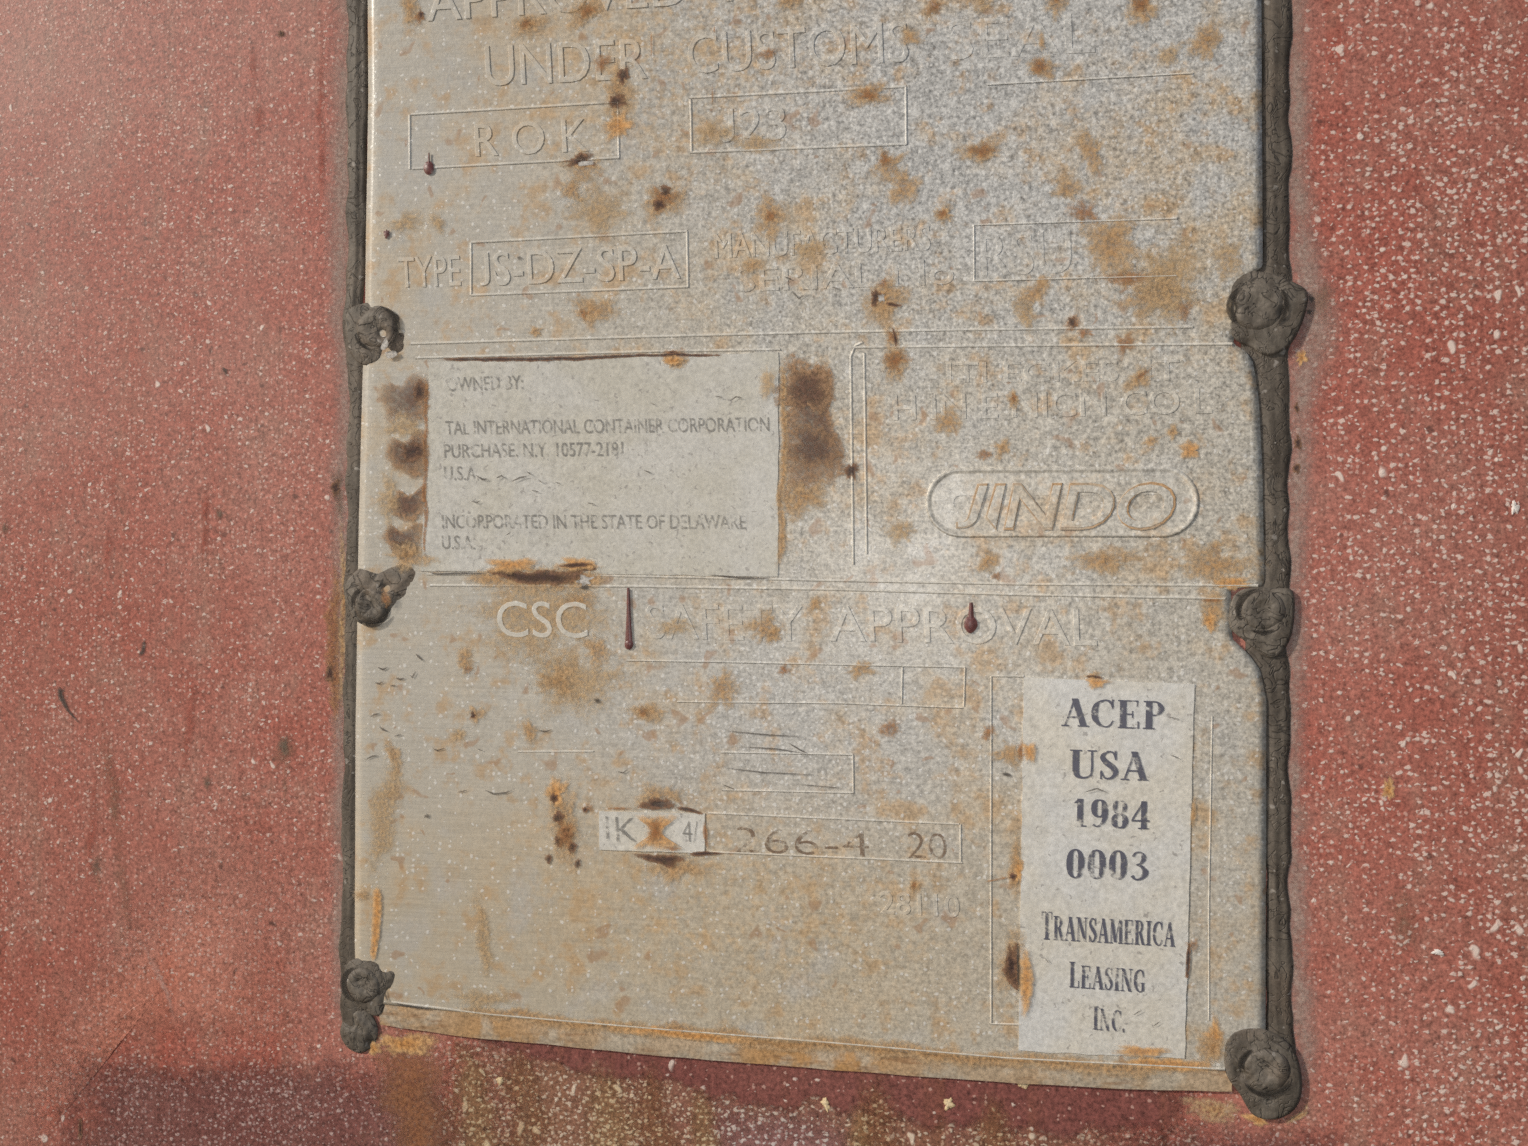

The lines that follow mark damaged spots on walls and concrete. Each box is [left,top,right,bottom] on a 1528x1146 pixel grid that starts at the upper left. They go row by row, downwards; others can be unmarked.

corrosion [1029,33,1056,79]
corrosion [596,57,632,138]
corrosion [560,150,626,229]
corrosion [645,184,684,216]
corrosion [875,149,922,204]
corrosion [1053,132,1194,319]
corrosion [444,350,719,368]
corrosion [864,279,909,379]
corrosion [1066,316,1092,337]
corrosion [470,558,615,705]
corrosion [545,778,590,868]
corrosion [608,786,722,881]